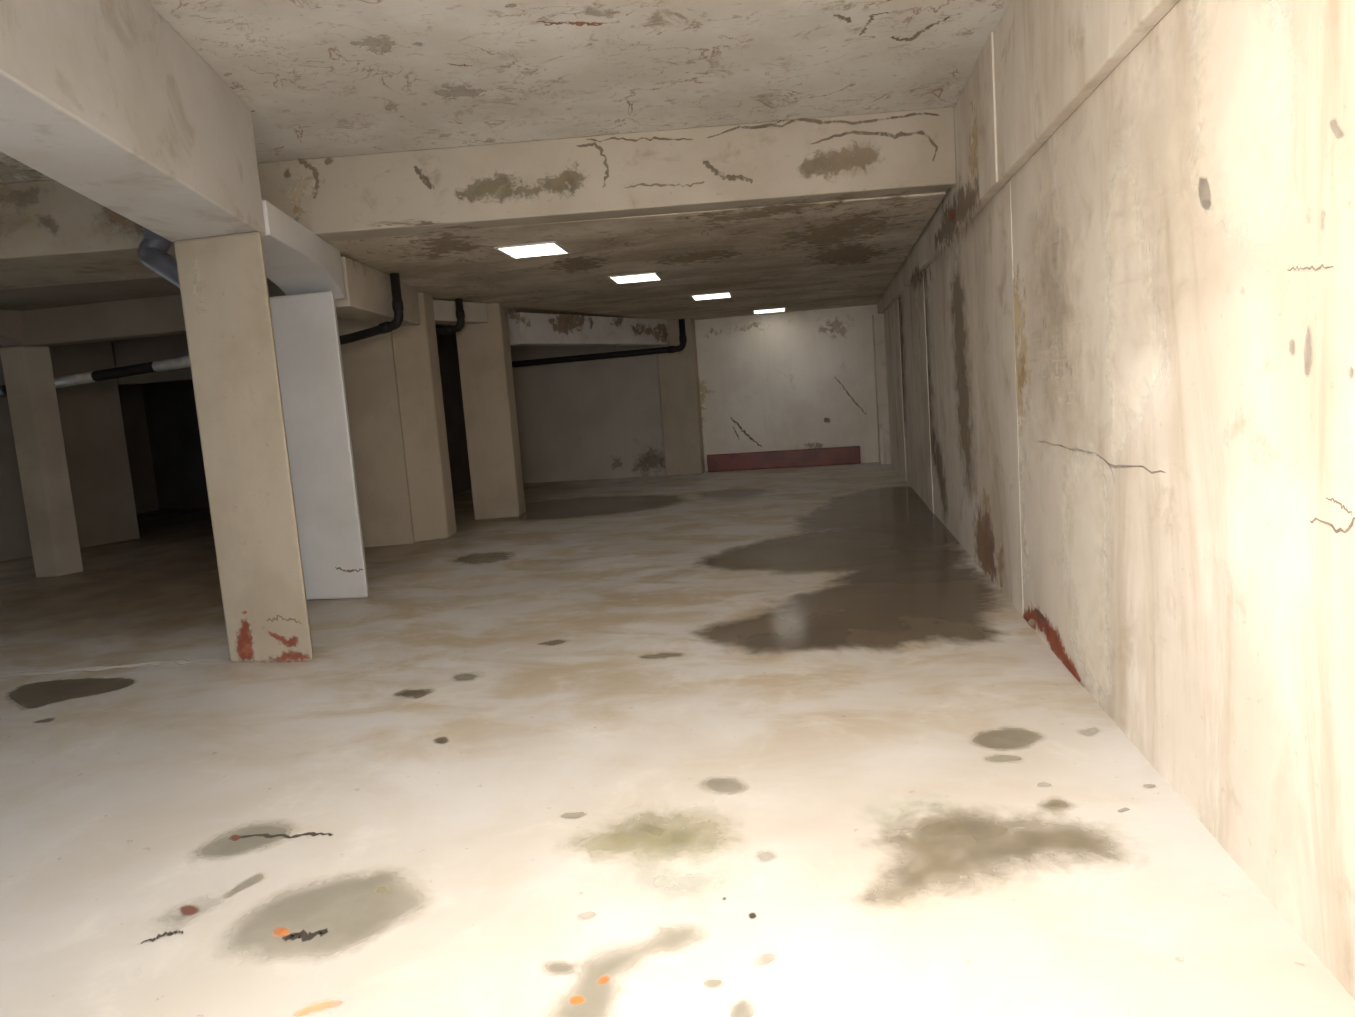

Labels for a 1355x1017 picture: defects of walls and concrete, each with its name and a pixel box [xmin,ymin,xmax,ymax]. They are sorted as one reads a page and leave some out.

peeling [455,163,586,203]
peeling [577,142,609,187]
crack [586,113,938,188]
peeling [800,131,938,178]
damp [388,221,481,258]
damp [685,197,923,266]
damp [935,179,980,249]
crack [1041,441,1164,484]
crack [1310,497,1355,533]
rust [236,611,310,663]